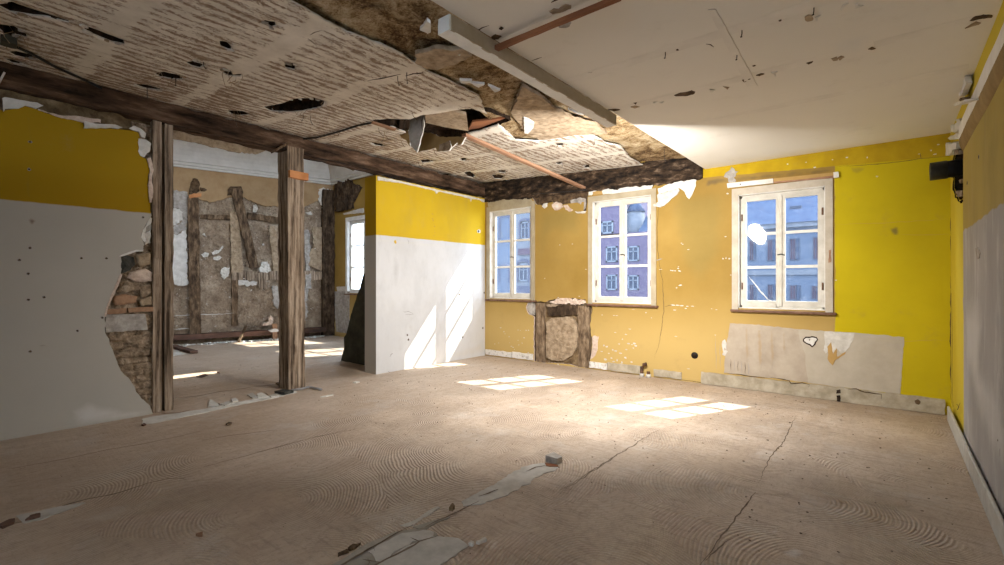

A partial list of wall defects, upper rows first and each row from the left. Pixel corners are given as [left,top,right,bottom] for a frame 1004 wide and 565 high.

spalling [0,2,68,21]
spalling [0,24,26,36]
spalling [85,27,124,43]
spalling [137,72,182,89]
spalling [265,98,324,111]
spalling [373,119,410,131]
spalling [424,107,511,137]
spalling [173,130,265,155]
spalling [377,176,696,214]
spalling [2,97,154,410]
flaking render [335,286,350,333]
spalling [520,296,637,368]